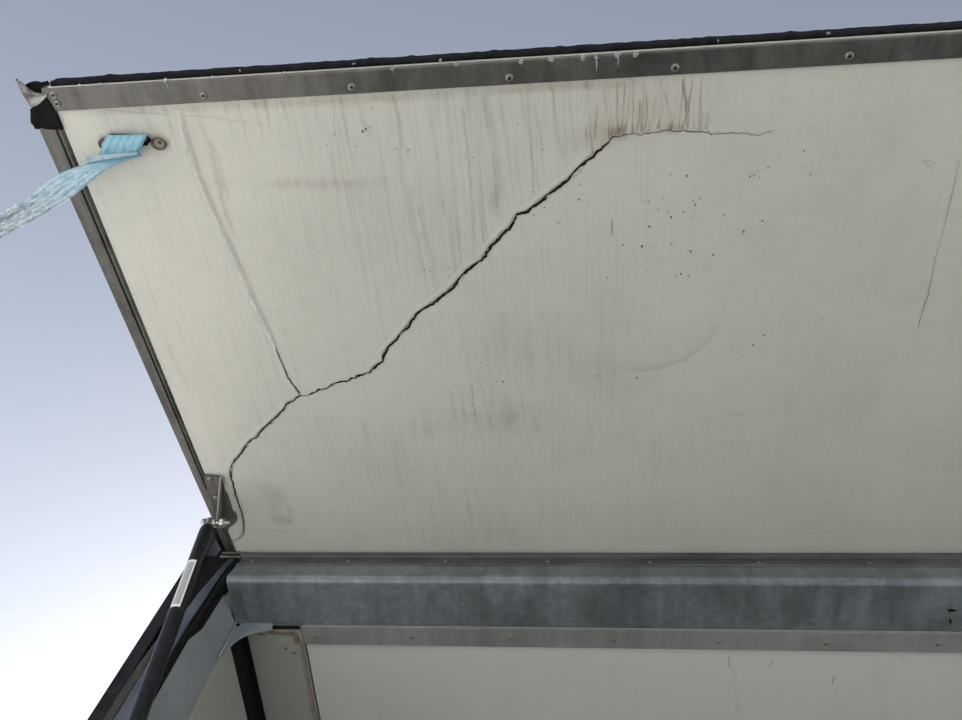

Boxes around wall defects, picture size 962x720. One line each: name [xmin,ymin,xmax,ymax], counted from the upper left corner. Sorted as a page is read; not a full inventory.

crack [223,129,774,541]